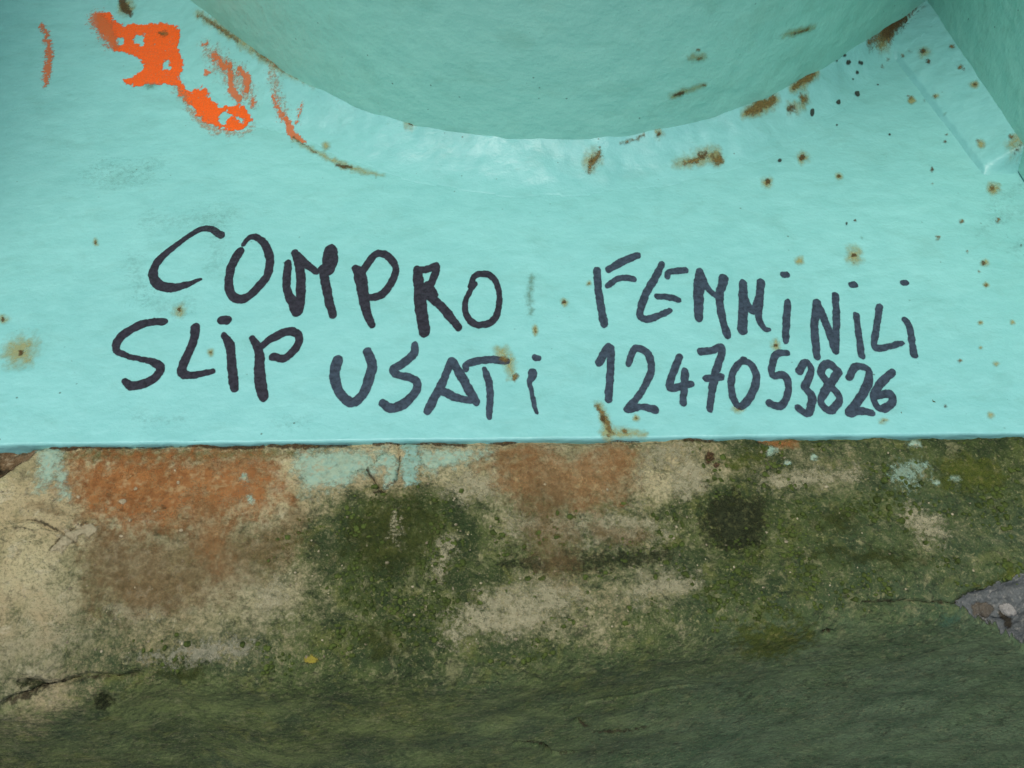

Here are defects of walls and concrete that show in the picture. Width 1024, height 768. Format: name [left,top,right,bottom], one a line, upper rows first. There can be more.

rust [868,6,924,48]
peeling [38,22,55,87]
peeling [85,7,257,138]
rust [742,71,819,116]
rust [683,150,724,165]
rust [596,405,646,440]
damp [377,444,495,510]
damp [760,462,863,490]
rust [60,448,297,572]
damp [899,497,948,551]
damp [436,503,702,651]
crack [5,674,143,704]